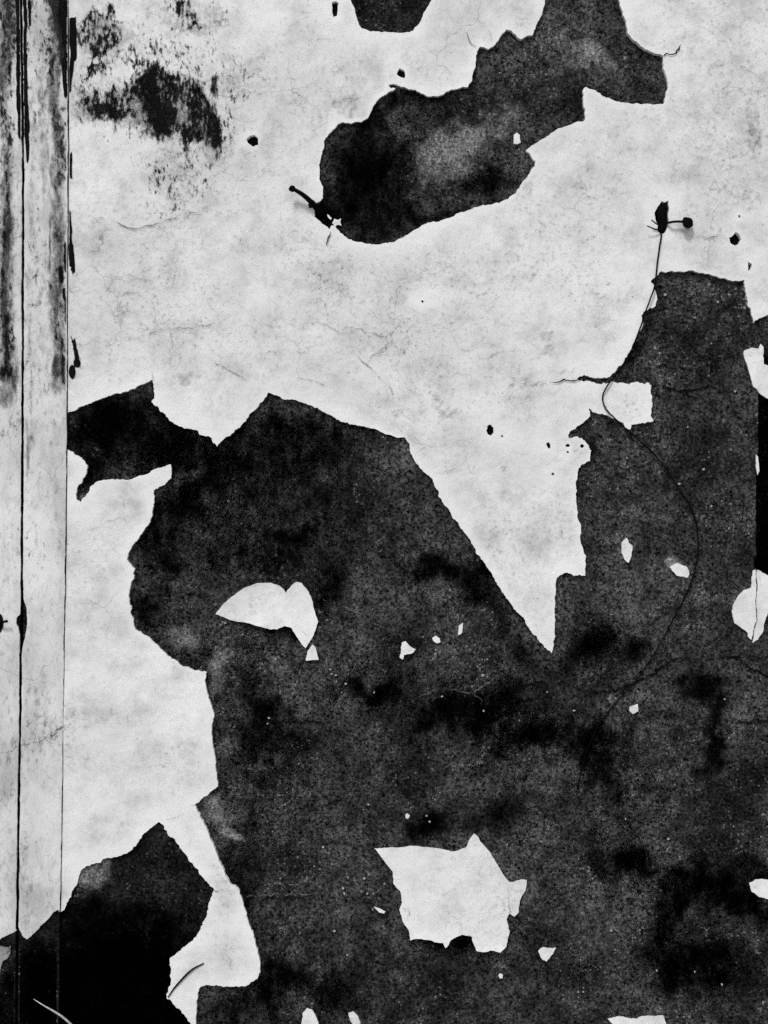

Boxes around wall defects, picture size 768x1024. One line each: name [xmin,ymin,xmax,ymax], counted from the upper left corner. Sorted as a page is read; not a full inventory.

peeling [308,0,667,245]
leakage [0,0,249,404]
peeling [104,380,155,401]
crack [651,385,715,398]
peeling [68,404,156,480]
peeling [77,482,90,502]
peeling [128,264,768,1024]
crack [578,655,768,696]
peeling [0,822,214,1024]